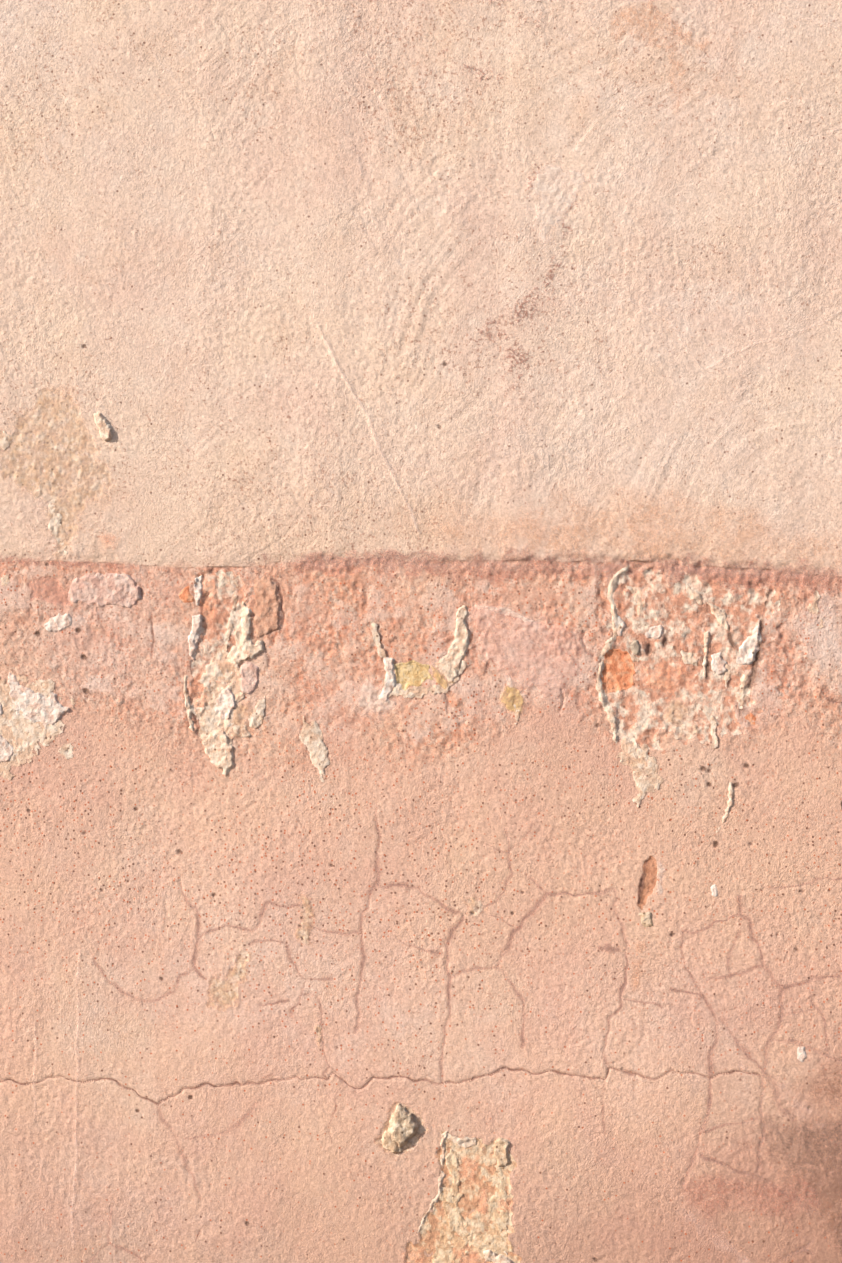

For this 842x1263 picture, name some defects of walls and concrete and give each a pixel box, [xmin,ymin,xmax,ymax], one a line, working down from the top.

peeling [0,672,89,780]
peeling [179,570,266,776]
peeling [359,605,470,712]
peeling [596,558,788,808]
crack [360,823,405,980]
crack [439,902,464,1014]
crack [606,953,628,1037]
crack [672,895,763,1012]
crack [0,1029,660,1105]
peeling [405,1131,522,1263]
crack [703,1049,819,1212]
damp [689,1124,842,1248]